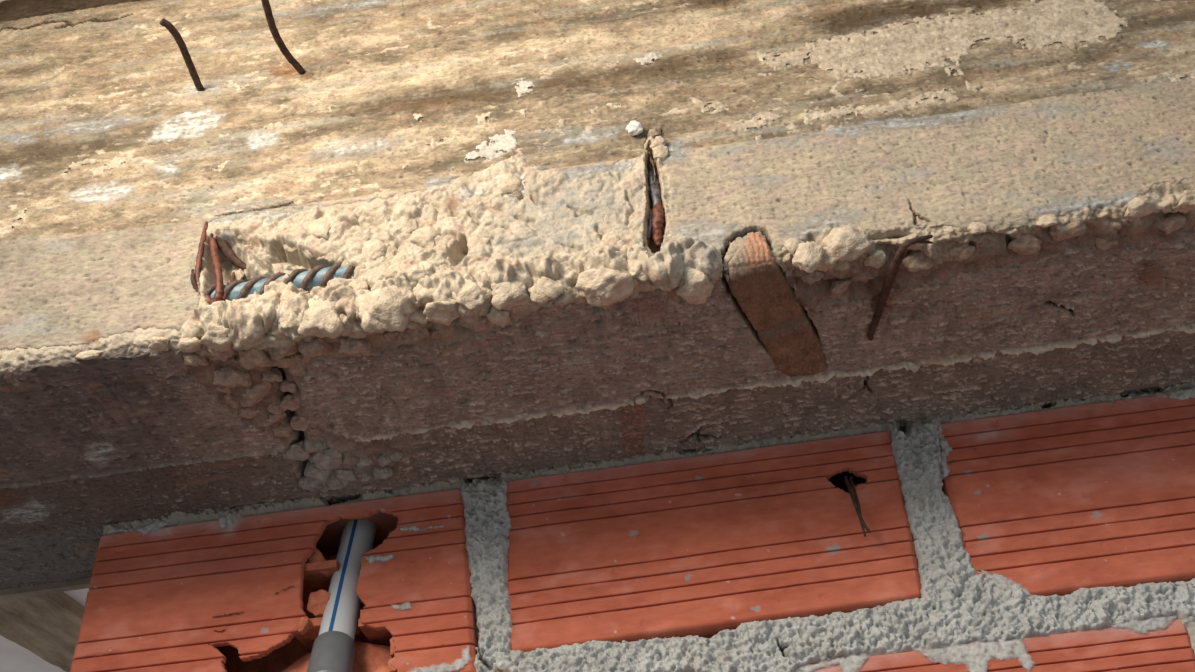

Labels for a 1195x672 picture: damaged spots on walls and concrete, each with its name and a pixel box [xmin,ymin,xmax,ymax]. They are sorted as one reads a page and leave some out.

peeling [512,78,535,117]
peeling [636,52,660,65]
peeling [756,0,1129,125]
spalling [0,112,724,392]
hole [217,548,340,672]
hole [352,602,397,672]